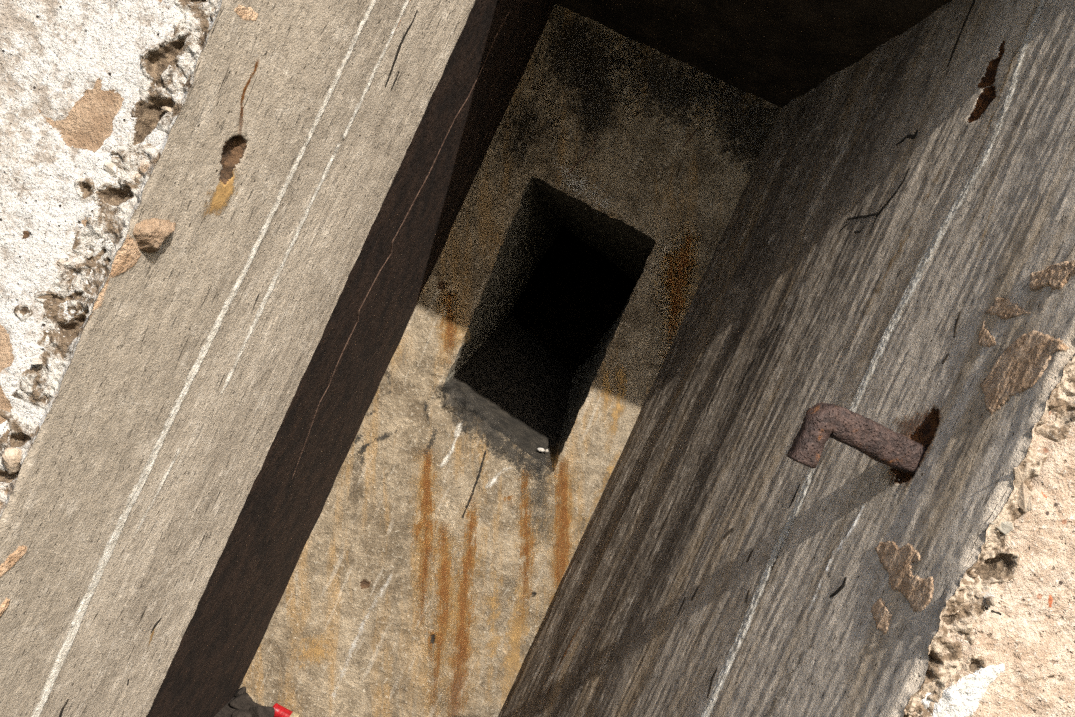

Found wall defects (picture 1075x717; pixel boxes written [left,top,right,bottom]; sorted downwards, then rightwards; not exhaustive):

spalling [131,0,222,136]
spalling [11,134,163,415]
spalling [219,135,248,185]
crack [292,10,510,479]
rust [663,236,696,335]
crack [840,130,918,234]
spalling [0,409,40,517]
rust [412,455,477,697]
crack [462,450,487,518]
rust [487,475,535,669]
rust [551,463,572,600]
spalling [904,446,1048,717]